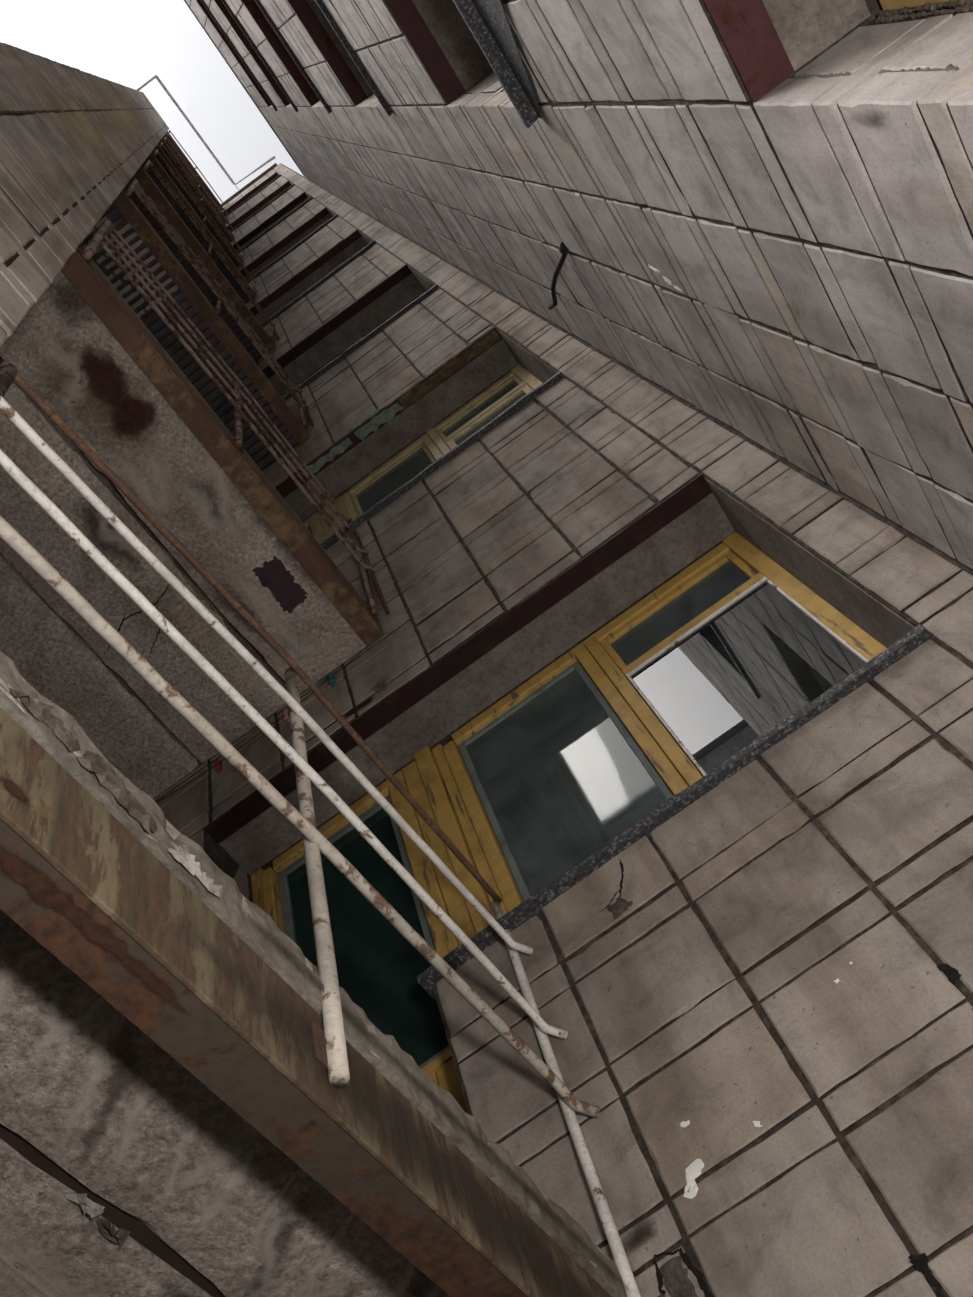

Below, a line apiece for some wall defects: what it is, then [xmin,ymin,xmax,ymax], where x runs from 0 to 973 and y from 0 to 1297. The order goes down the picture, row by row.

corrosion [3,779,53,819]
corrosion [0,846,183,1011]
spalling [654,1247,715,1297]